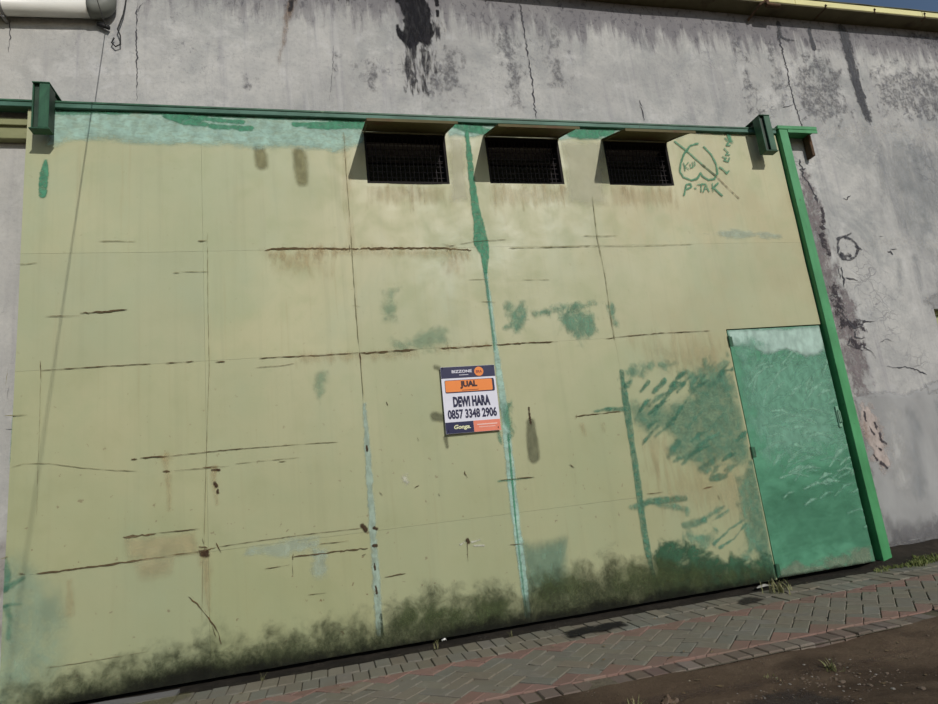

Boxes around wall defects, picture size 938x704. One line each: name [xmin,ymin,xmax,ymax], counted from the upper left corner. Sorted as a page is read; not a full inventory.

crack [134,3,142,100]
leakage [395,0,440,94]
crack [519,4,537,115]
crack [779,41,802,125]
leakage [803,24,872,125]
leakage [837,233,862,261]
flaking render [801,172,890,469]
crack [837,267,927,375]
rust [17,440,296,500]
rust [37,557,161,574]
rust [124,516,368,570]